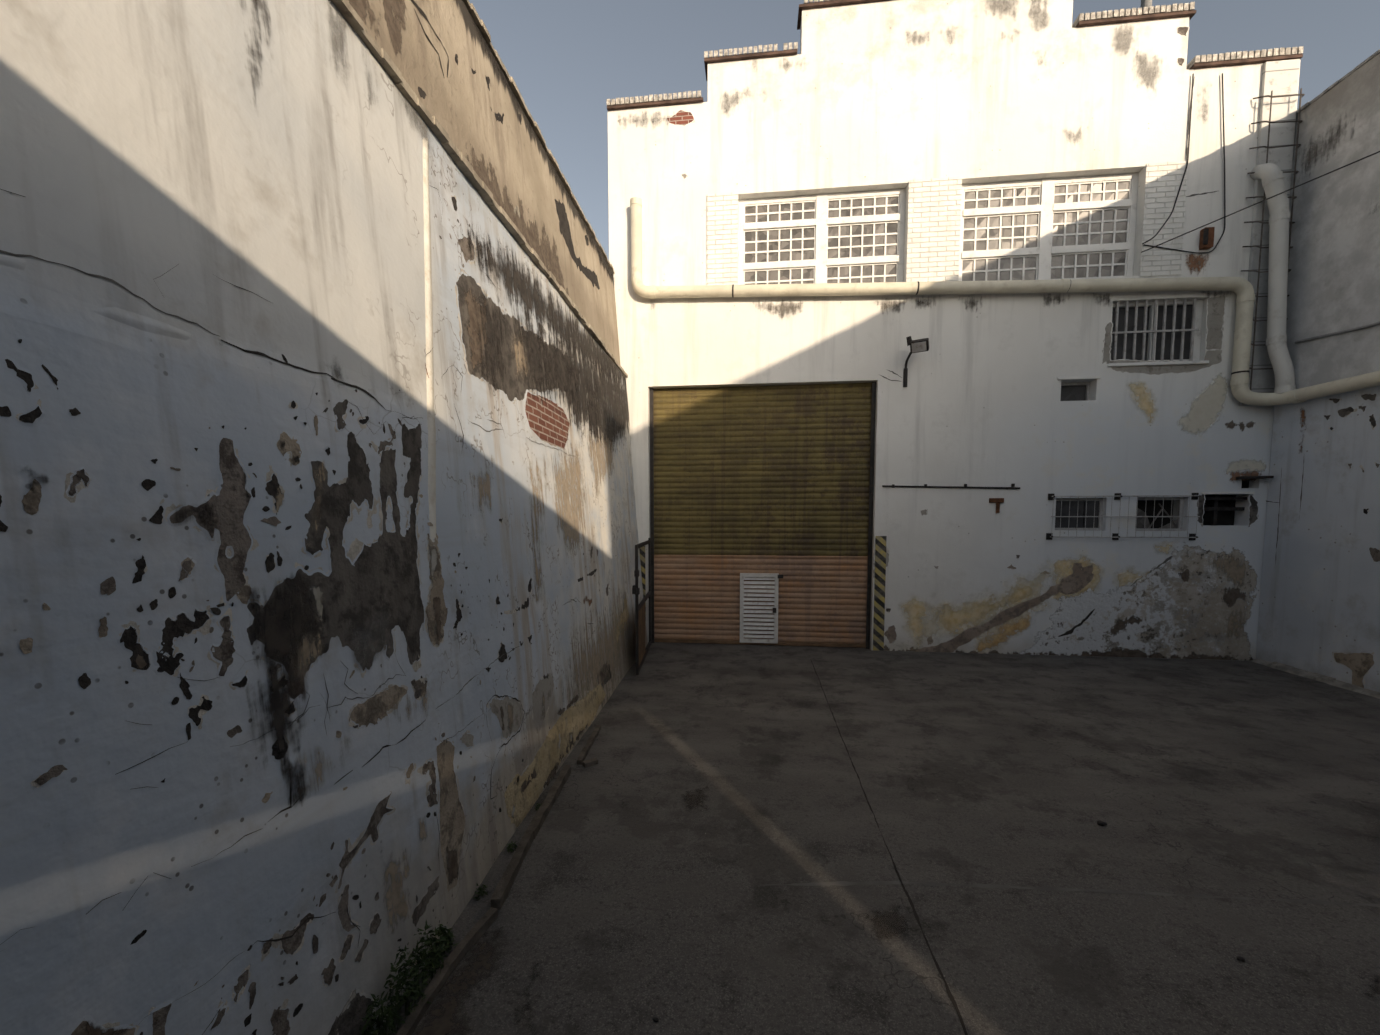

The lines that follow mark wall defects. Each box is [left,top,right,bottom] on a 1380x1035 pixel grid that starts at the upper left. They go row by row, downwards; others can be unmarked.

leakage [474,20,568,193]
crack [0,250,427,446]
crack [425,348,580,459]
spalling [429,185,580,452]
leakage [467,148,630,601]
peeling [1324,393,1377,431]
spalling [98,389,468,740]
leakage [884,558,1099,656]
spalling [916,545,1257,661]
spalling [1248,494,1259,528]
spalling [67,660,611,1035]
crack [811,660,968,1035]